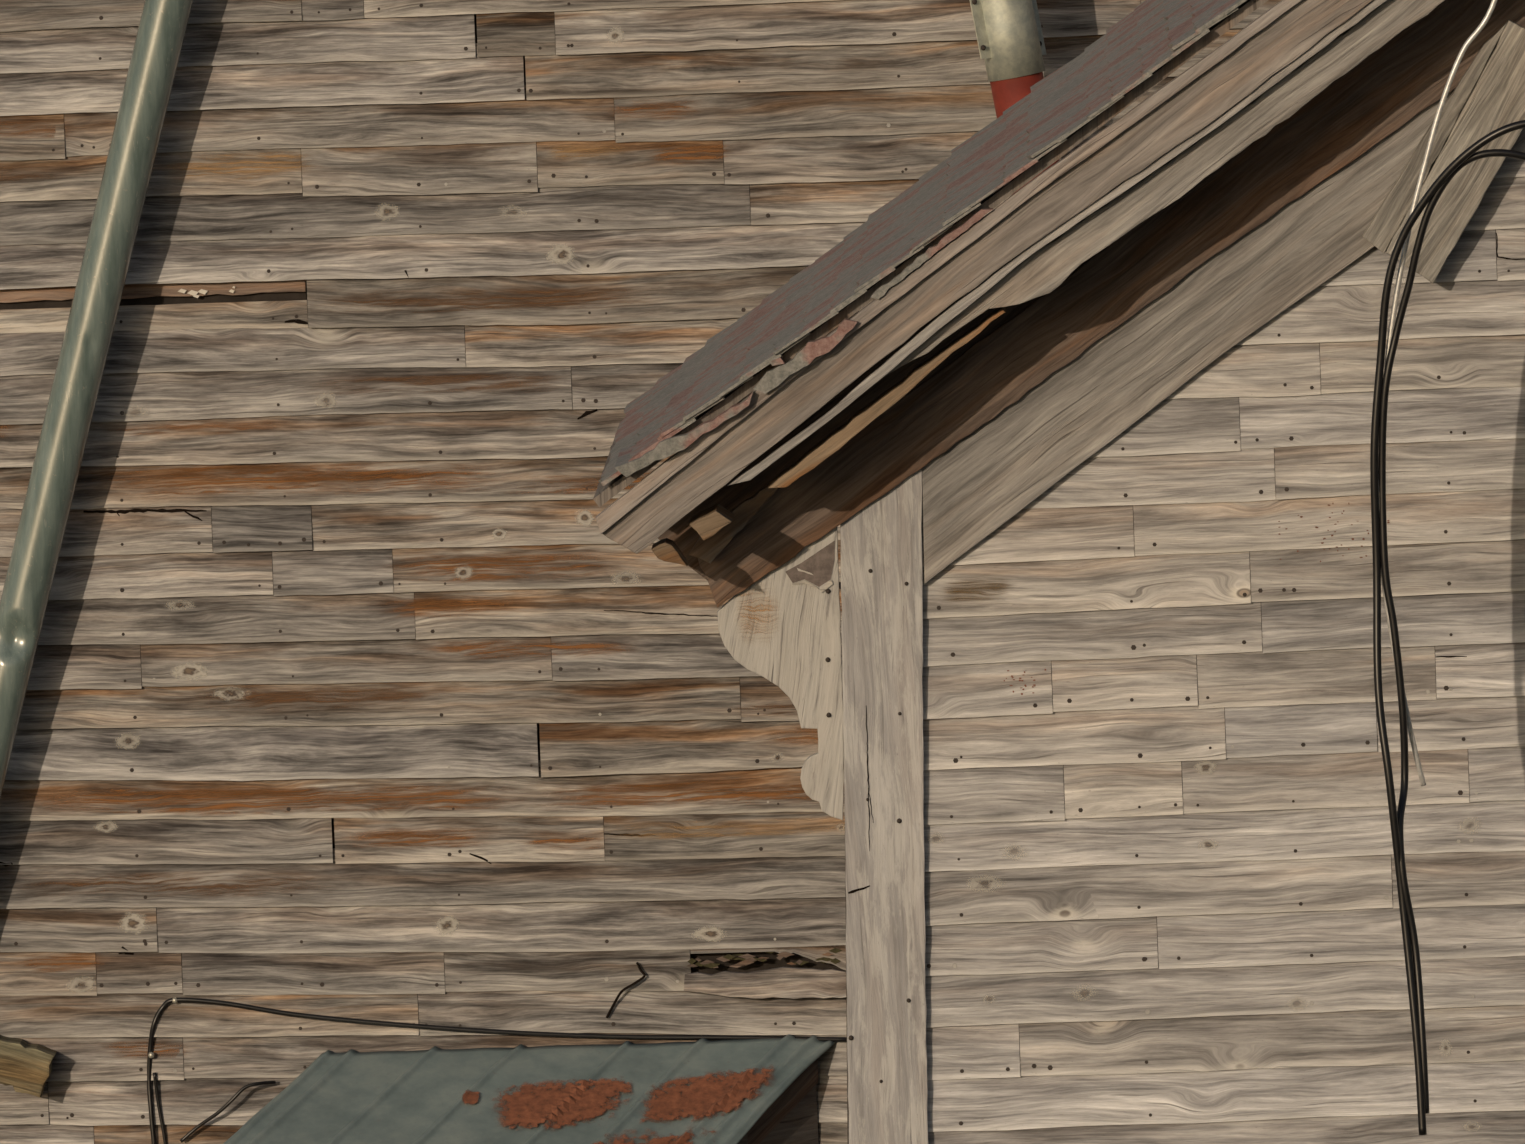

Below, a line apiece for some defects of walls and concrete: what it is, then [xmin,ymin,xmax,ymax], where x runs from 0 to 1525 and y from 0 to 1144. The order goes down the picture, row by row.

rust [462,1090,479,1105]
rust [498,1078,631,1129]
rust [594,1067,773,1144]